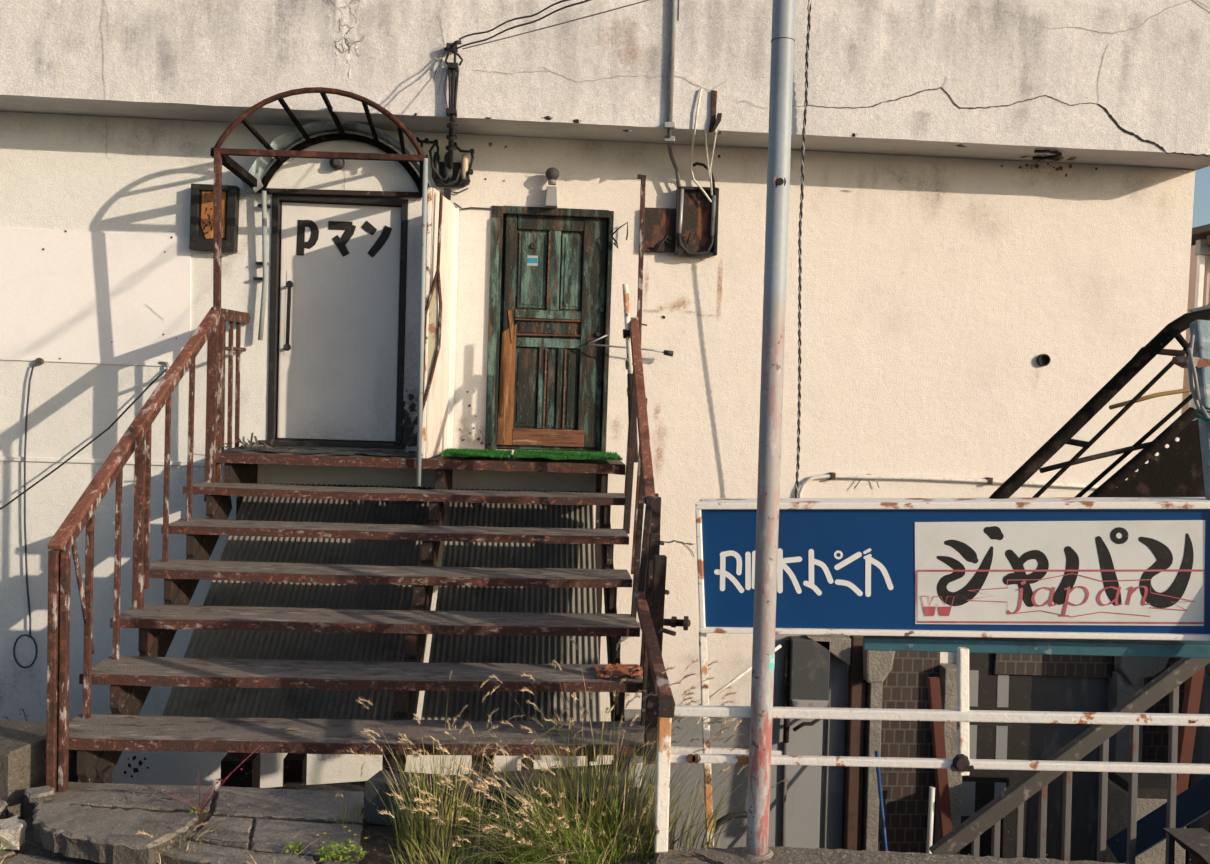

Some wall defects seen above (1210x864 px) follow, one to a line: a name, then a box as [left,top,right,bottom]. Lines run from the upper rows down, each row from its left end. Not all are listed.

crack [430,0,1210,157]
crack [679,853,724,864]